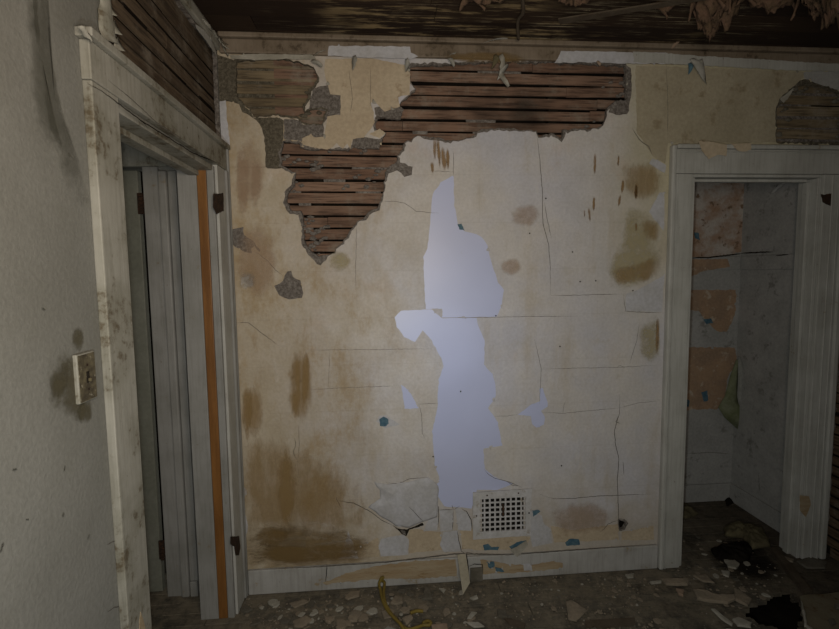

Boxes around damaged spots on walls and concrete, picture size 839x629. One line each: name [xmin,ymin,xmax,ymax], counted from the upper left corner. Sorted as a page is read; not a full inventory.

flaking render [78,0,839,276]
flaking render [275,271,303,299]
flaking render [690,289,737,333]
flaking render [687,347,737,410]
water stain [251,455,364,564]
crack [264,347,655,582]